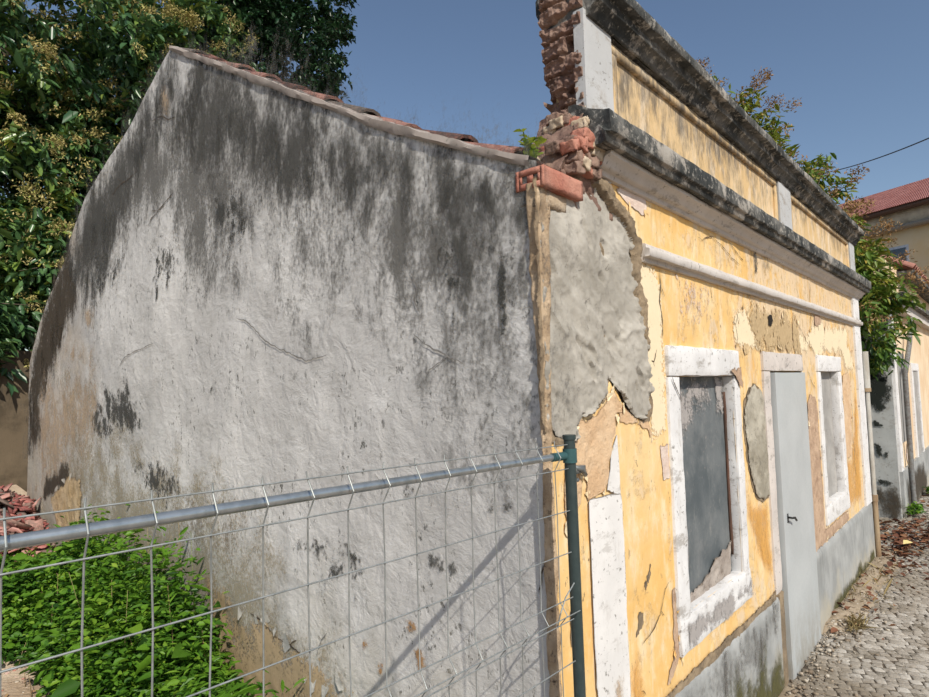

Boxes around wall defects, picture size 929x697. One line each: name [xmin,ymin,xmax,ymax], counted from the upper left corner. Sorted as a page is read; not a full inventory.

damp [104,519,305,668]
damp [25,37,538,521]
crack [237,318,327,362]
damp [329,543,363,578]
peeling [526,102,670,697]
spalling [690,542,731,602]
spalling [666,579,776,697]
spalling [731,367,769,502]
peeling [733,295,854,458]
spalling [807,394,849,552]
damp [870,369,892,426]
damp [877,479,903,519]